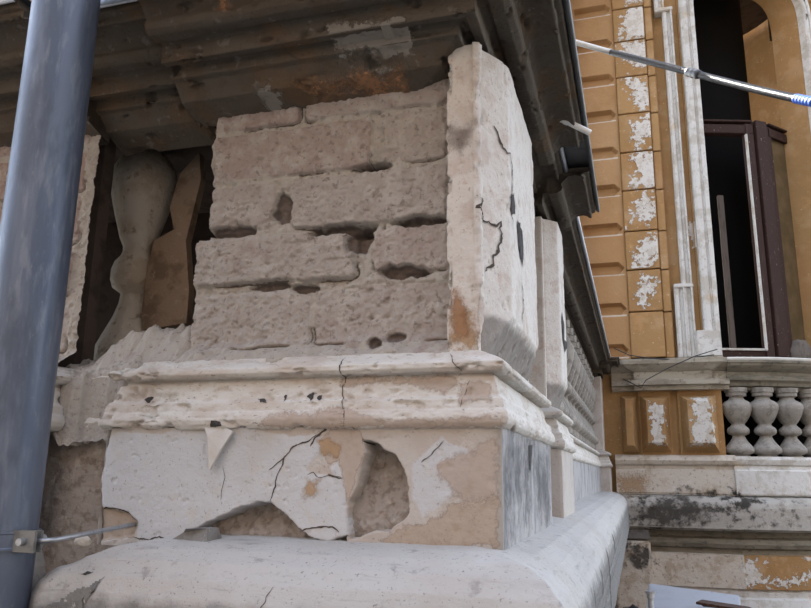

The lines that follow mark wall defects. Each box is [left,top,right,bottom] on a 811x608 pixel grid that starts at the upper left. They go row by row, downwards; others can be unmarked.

peeling [617,0,661,313]
crack [475,126,514,271]
corrosion [448,289,477,349]
peeling [204,420,234,470]
crack [269,360,376,502]
peeling [210,392,503,549]
peeling [648,400,669,446]
peeling [688,391,732,455]
spalling [745,415,760,457]
spalling [771,418,784,457]
water stain [629,485,762,529]
peeling [738,555,811,590]